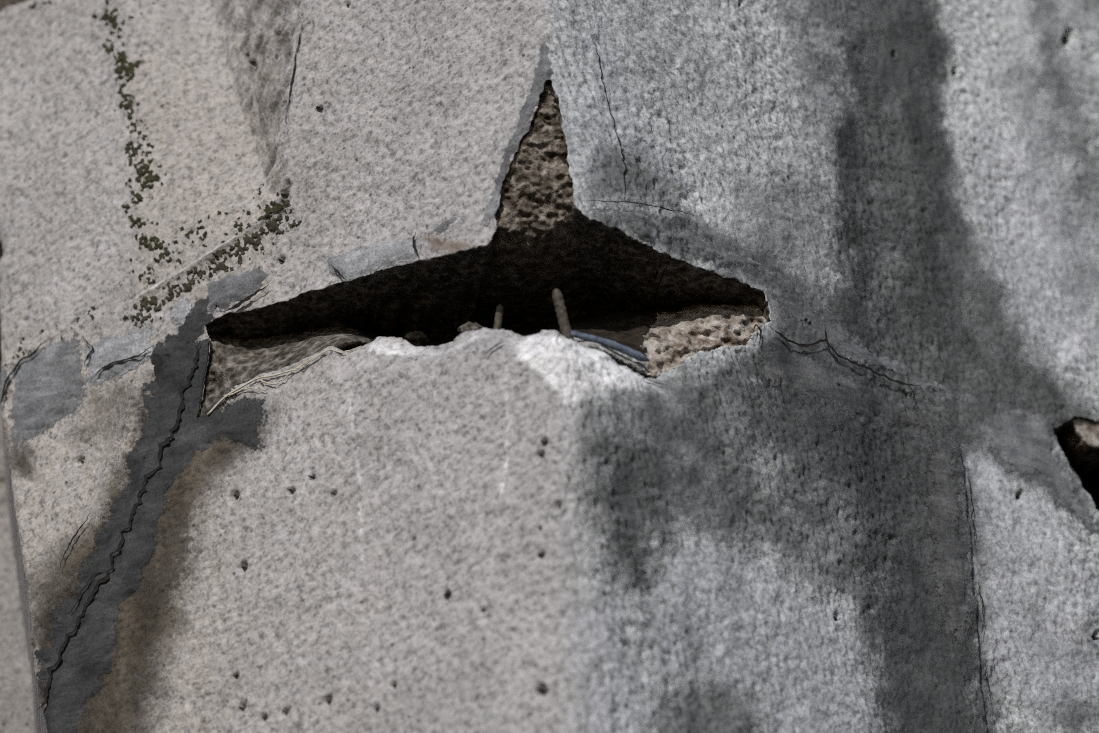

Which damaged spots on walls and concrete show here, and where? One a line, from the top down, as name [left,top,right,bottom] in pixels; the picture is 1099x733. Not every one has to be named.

crack [583,44,692,215]
spalling [199,85,767,417]
leakage [368,342,416,355]
leakage [516,0,1099,733]
crack [753,324,921,403]
spalling [1057,418,1099,511]
leakage [30,473,132,660]
leakage [75,412,270,733]